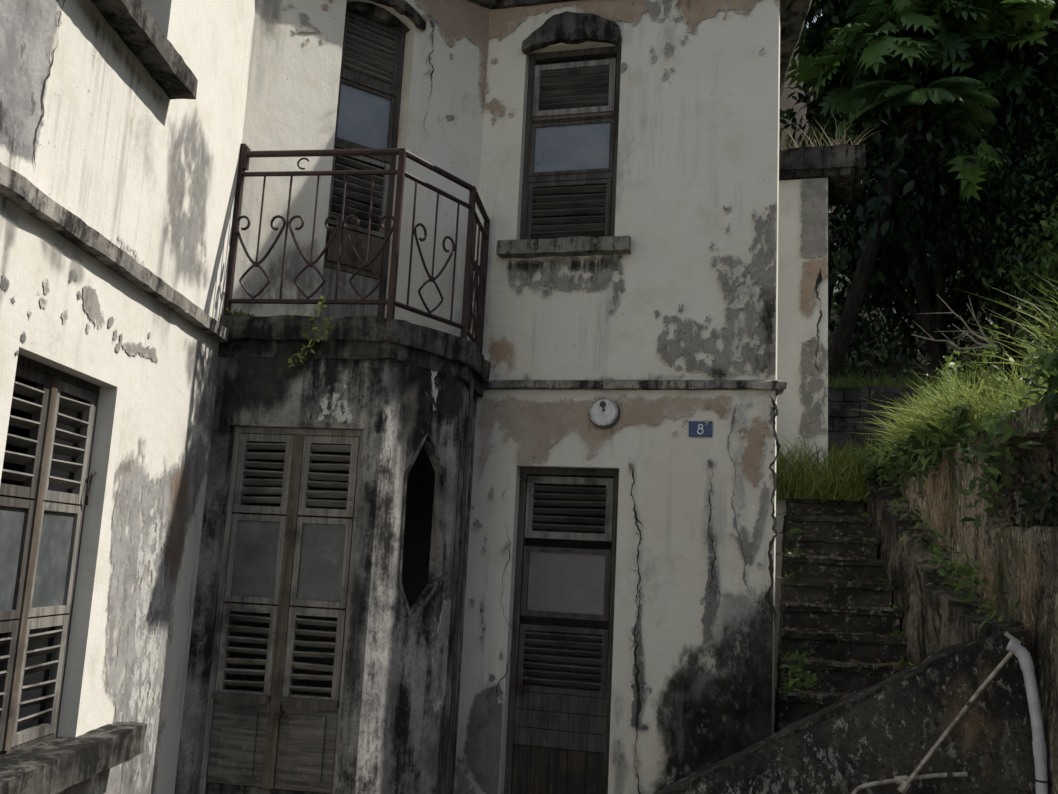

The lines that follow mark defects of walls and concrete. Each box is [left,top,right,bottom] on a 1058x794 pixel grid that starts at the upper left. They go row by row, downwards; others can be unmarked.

damp [0,0,59,160]
crack [424,14,436,132]
peeling [415,0,760,125]
flaking render [69,268,158,363]
damp [168,118,210,279]
damp [399,356,465,434]
peeling [654,203,777,378]
peeling [799,178,828,317]
crack [814,269,822,372]
crack [703,395,781,628]
crack [628,463,644,794]
damp [655,589,773,794]